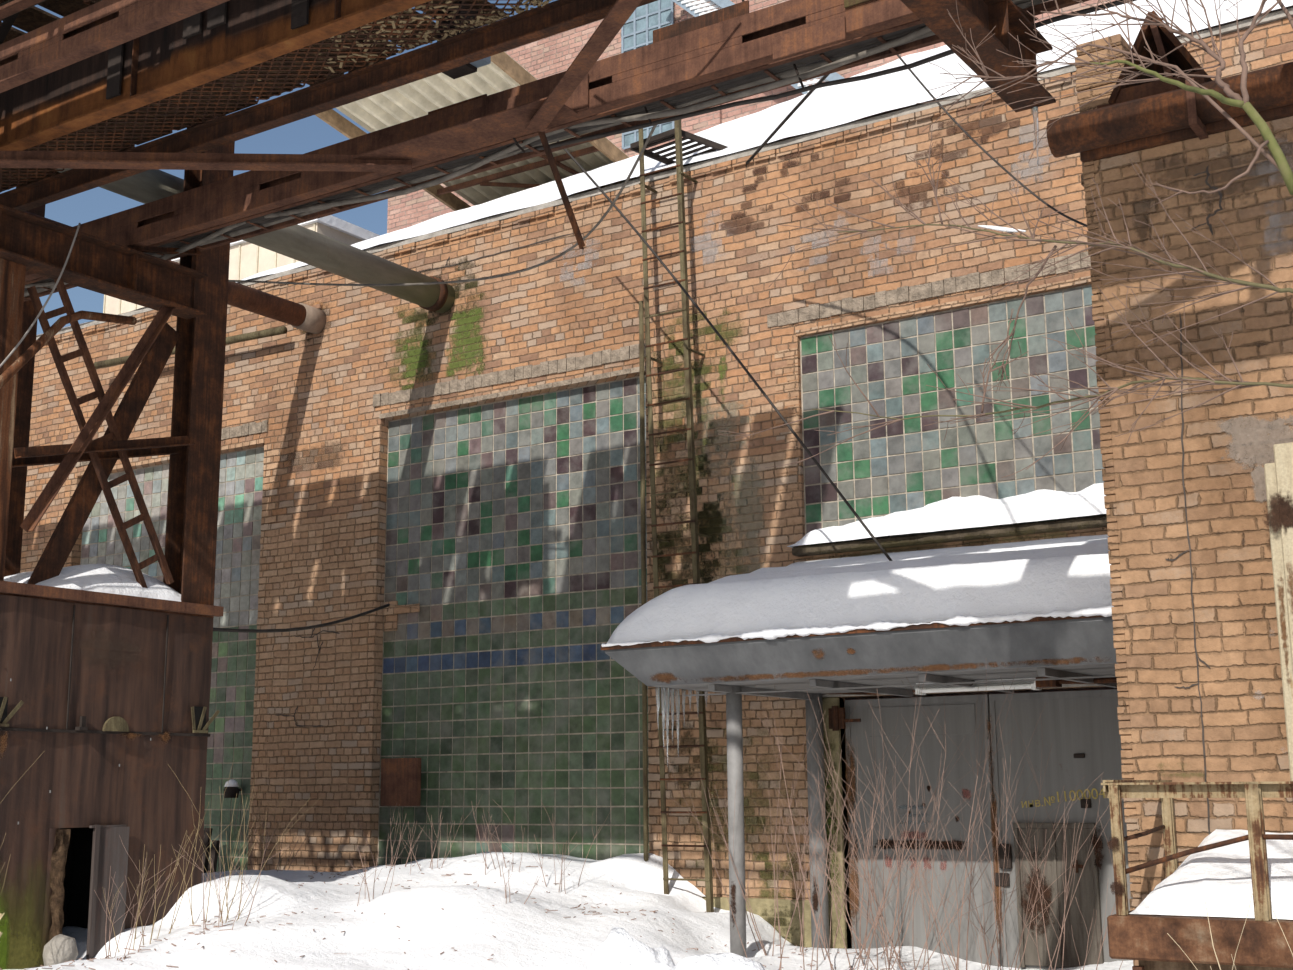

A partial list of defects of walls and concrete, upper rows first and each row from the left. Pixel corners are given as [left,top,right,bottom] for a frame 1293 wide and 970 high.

spalling [721,150,819,234]
spalling [796,178,851,211]
damp [392,313,432,390]
damp [447,305,484,376]
damp [657,324,738,494]
peeling [1251,466,1267,502]
rust [1091,826,1120,870]
rust [1110,882,1125,895]